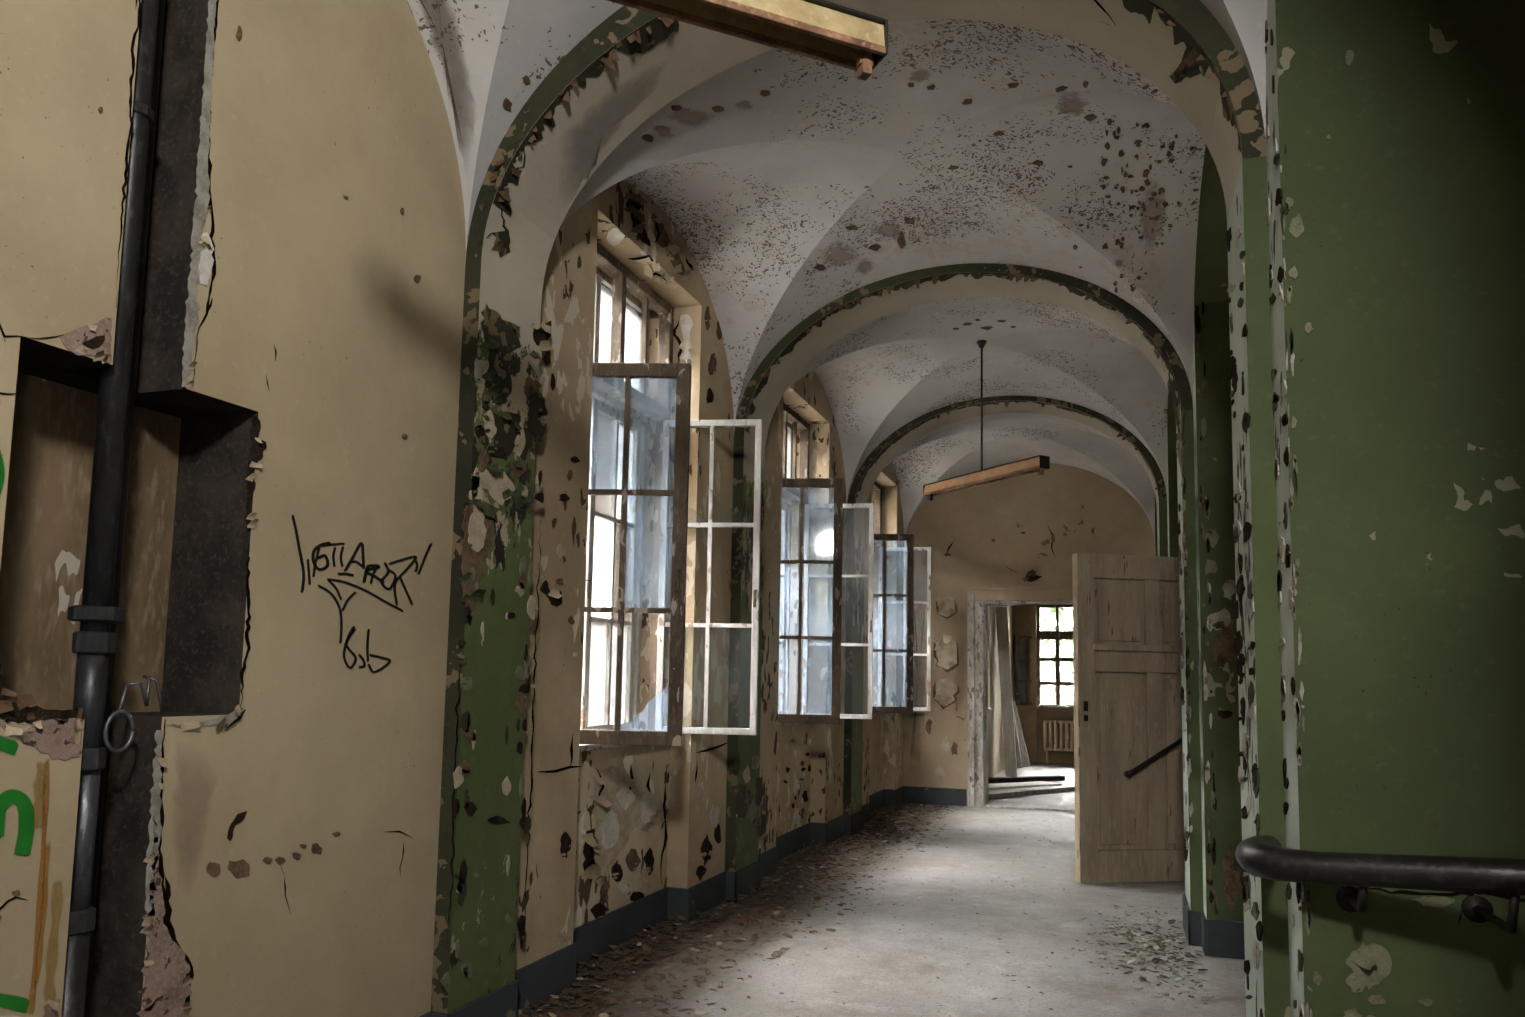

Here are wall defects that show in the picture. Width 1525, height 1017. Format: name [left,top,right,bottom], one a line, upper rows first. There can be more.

crack [193,0,219,386]
peeling [478,15,679,258]
peeling [1084,114,1199,250]
peeling [1122,0,1241,152]
peeling [1266,125,1304,308]
peeling [458,303,580,754]
peeling [1271,322,1313,815]
flaking render [0,663,85,762]
flaking render [136,415,267,1017]
peeling [453,711,531,833]
peeling [692,739,811,881]
peeling [1344,943,1392,1017]